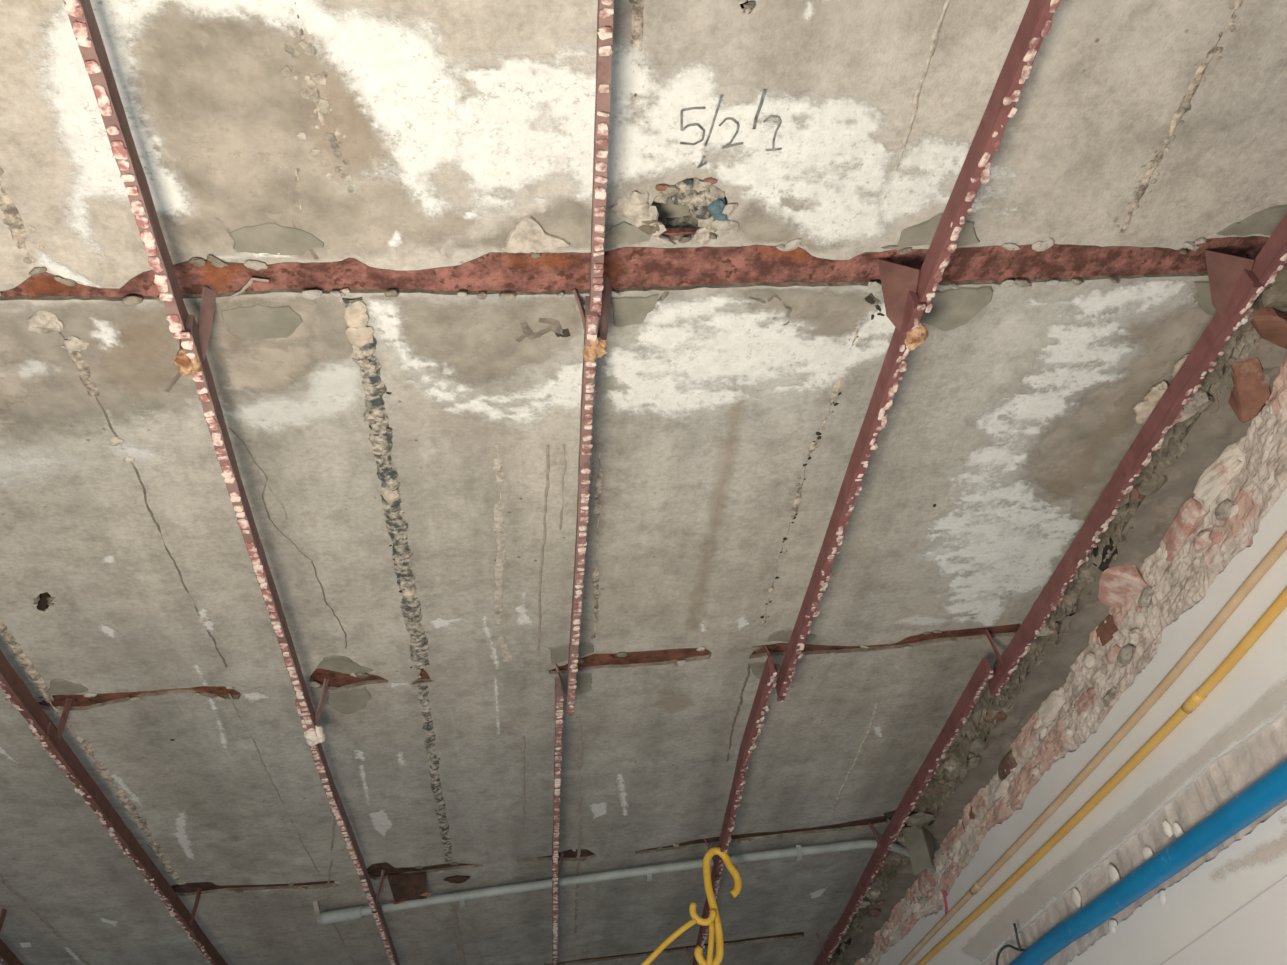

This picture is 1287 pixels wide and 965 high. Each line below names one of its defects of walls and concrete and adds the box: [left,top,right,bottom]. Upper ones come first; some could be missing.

spalling [0,267,164,306]
efflorescence [37,3,129,257]
crack [27,310,319,873]
crack [229,428,347,649]
spalling [173,252,578,271]
water stain [90,0,970,258]
spalling [182,281,883,364]
water stain [368,289,895,424]
spalling [604,177,929,261]
peeling [635,304,1287,965]
water stain [903,280,1214,626]
spalling [938,272,1208,289]